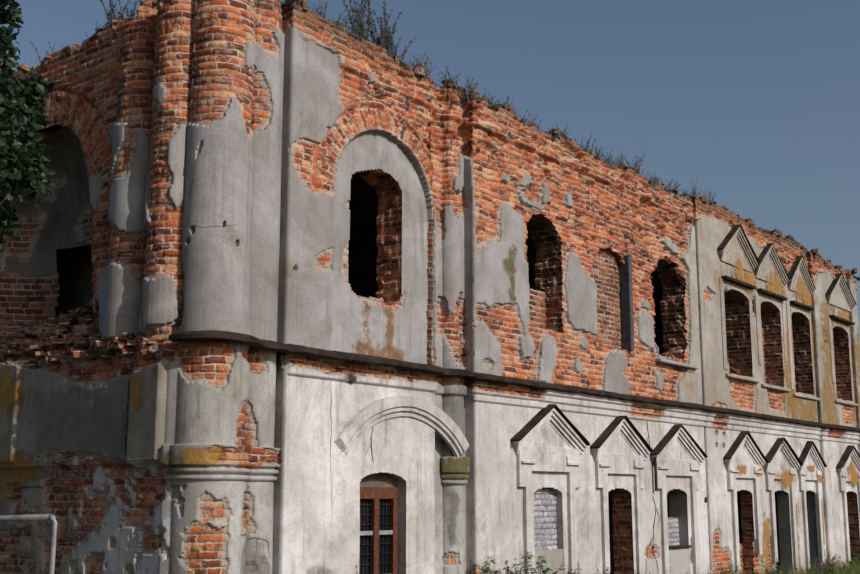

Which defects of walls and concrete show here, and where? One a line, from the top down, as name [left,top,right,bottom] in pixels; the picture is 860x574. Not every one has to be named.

flaking render [0,0,559,401]
flaking render [564,191,574,208]
flaking render [660,239,679,255]
spalling [762,229,857,279]
flaking render [564,254,598,373]
flaking render [636,300,667,359]
flaking render [602,351,664,419]
spalling [208,400,281,471]
spalling [0,451,186,574]
spalling [182,493,256,574]
crack [646,497,660,568]